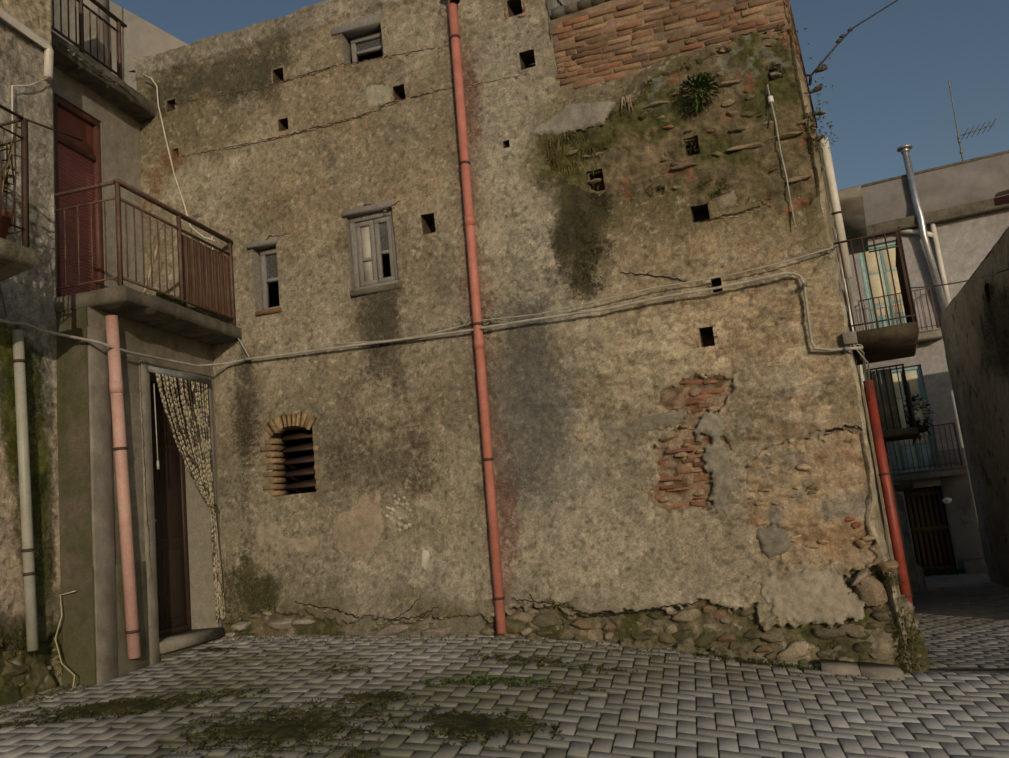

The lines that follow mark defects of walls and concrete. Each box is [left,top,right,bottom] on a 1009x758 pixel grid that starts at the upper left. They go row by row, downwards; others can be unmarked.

crack [170,44,449,107]
crack [172,74,527,159]
damp [537,167,612,292]
damp [8,425,19,487]
flaking render [648,375,733,512]
crack [825,424,862,434]
spalling [224,429,931,673]
crack [294,595,447,622]
crack [511,593,701,616]